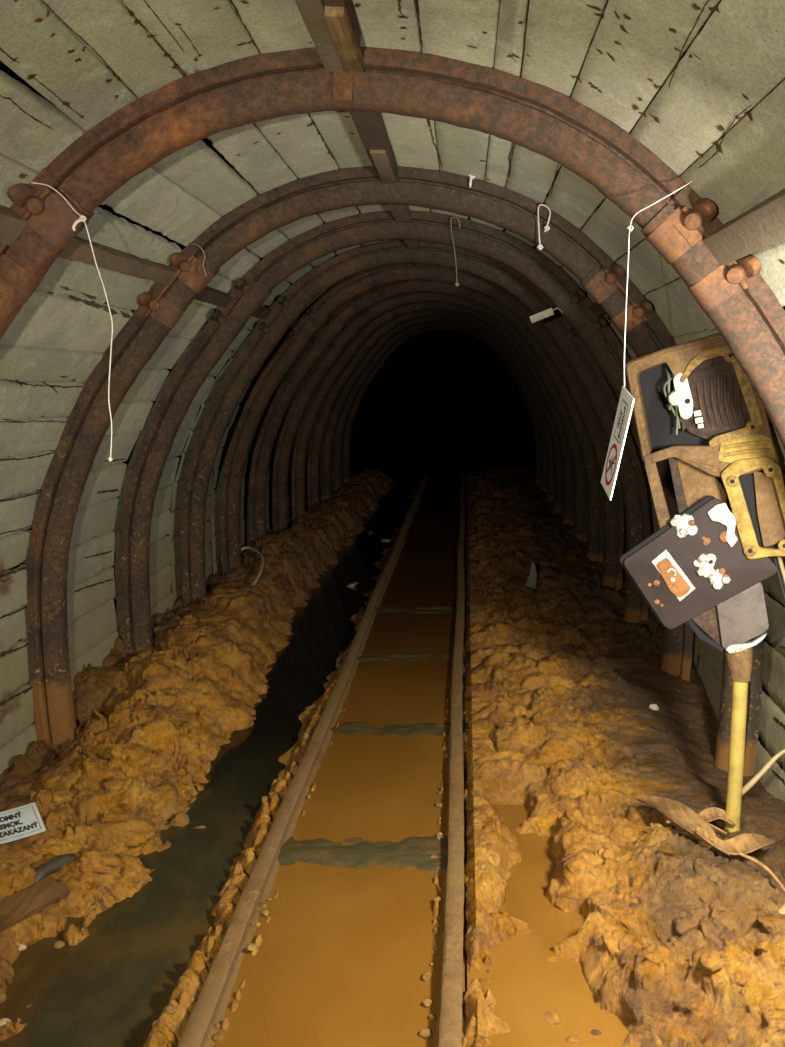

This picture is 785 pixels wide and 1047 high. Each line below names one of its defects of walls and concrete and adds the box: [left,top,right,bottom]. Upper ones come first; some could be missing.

crack [144,0,184,52]
corrosion [126,6,202,77]
crack [414,0,423,48]
corrosion [587,5,631,61]
crack [0,95,53,130]
corrosion [27,74,84,118]
crack [699,105,751,168]
crack [0,376,84,393]
crack [1,417,66,425]
crack [0,452,53,461]
crack [0,492,41,534]
crack [0,643,28,657]